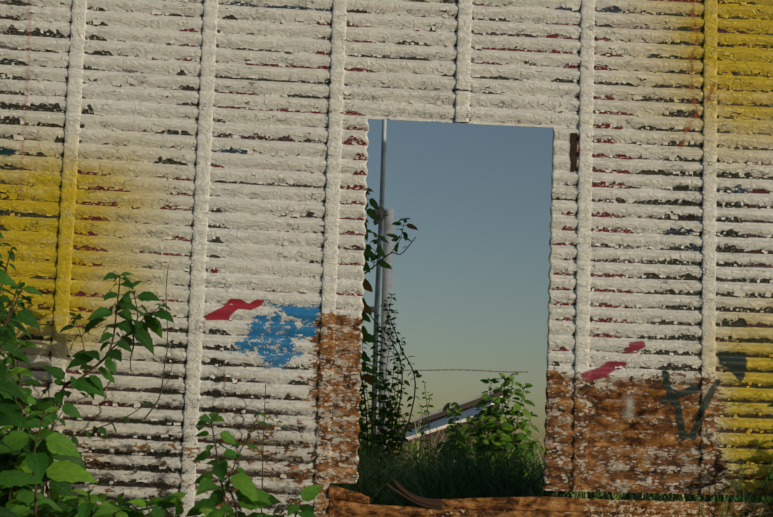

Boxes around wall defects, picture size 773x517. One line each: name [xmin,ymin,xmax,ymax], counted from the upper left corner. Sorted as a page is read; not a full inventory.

peeling [0,0,66,39]
peeling [347,0,455,72]
peeling [473,15,579,83]
peeling [0,47,65,143]
peeling [213,35,332,166]
peeling [152,122,196,211]
peeling [341,126,368,205]
peeling [715,131,773,268]
peeling [717,278,773,344]
peeling [77,419,185,503]
rust [304,428,357,465]
rust [546,383,714,462]